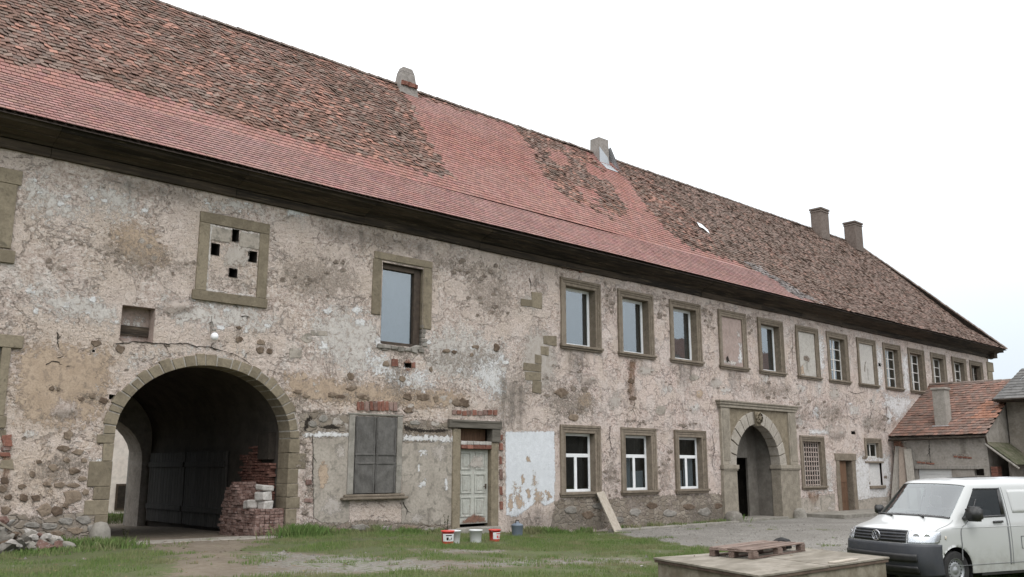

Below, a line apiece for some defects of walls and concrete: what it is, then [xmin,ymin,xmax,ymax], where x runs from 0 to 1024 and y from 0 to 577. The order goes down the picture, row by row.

flaking render [0,258,280,540]
crack [116,341,251,365]
flaking render [283,292,591,467]
peeling [499,430,723,530]